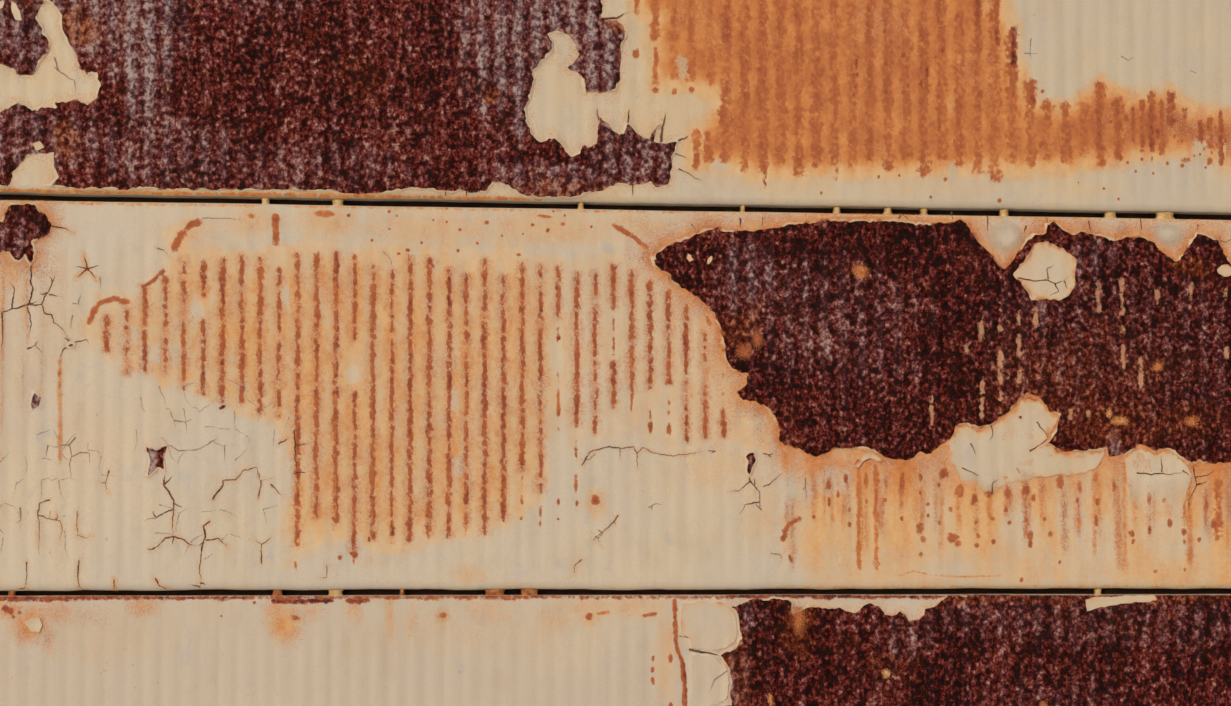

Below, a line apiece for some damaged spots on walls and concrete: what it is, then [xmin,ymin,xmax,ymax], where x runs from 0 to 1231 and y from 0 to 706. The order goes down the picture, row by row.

peeling [0,0,683,285]
corrosion [624,0,1231,199]
crack [0,225,101,356]
peeling [624,212,1231,510]
crack [0,431,119,591]
crack [135,379,312,590]
corrosion [0,187,1231,706]
crack [570,503,662,579]
crack [576,442,720,473]
crack [726,451,810,518]
crack [679,635,728,692]
peeling [680,594,1231,706]